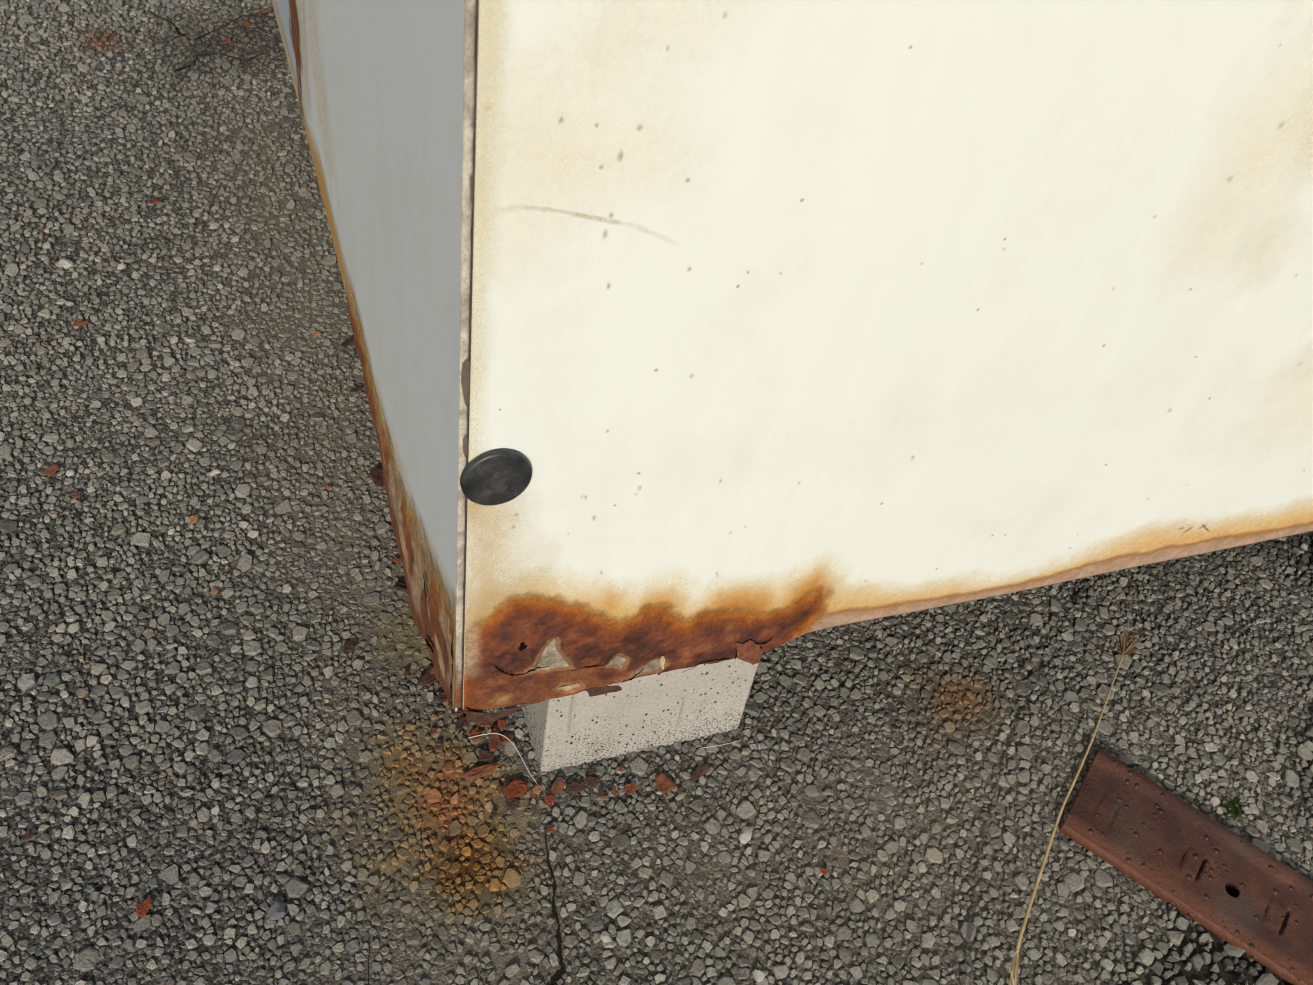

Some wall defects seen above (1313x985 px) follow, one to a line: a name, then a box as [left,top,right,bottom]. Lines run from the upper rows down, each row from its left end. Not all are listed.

rust [369,466,384,486]
rust [392,557,408,592]
rust [361,665,637,911]
rust [655,760,710,799]
crack [545,828,565,985]